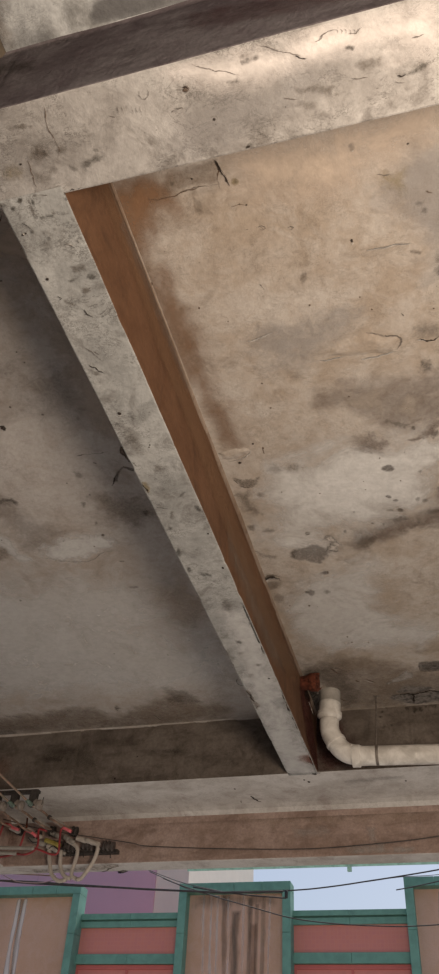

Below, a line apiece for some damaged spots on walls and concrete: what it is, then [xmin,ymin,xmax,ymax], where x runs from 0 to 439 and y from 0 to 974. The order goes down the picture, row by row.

damp [358,509,439,546]
peeling [46,534,114,562]
spalling [388,661,439,684]